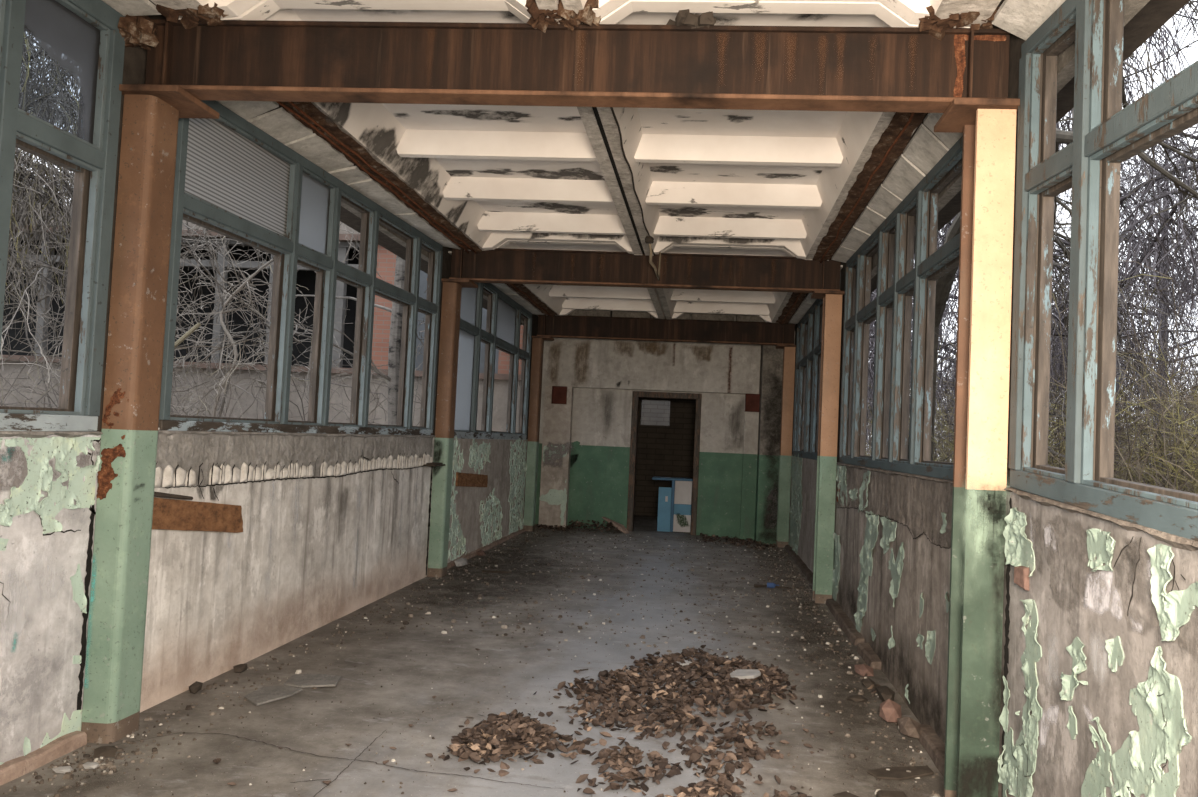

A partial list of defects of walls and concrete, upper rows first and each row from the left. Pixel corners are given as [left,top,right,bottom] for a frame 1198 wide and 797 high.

spalling [275,101,605,254]
peeling [662,207,707,217]
peeling [659,236,775,244]
spalling [812,112,926,263]
peeling [0,437,101,551]
peeling [70,564,87,614]
corrosion [96,388,129,500]
flaking render [155,433,433,500]
flaking render [836,465,953,649]
peeling [1086,528,1116,572]
peeling [997,507,1043,797]
peeling [1059,544,1198,797]